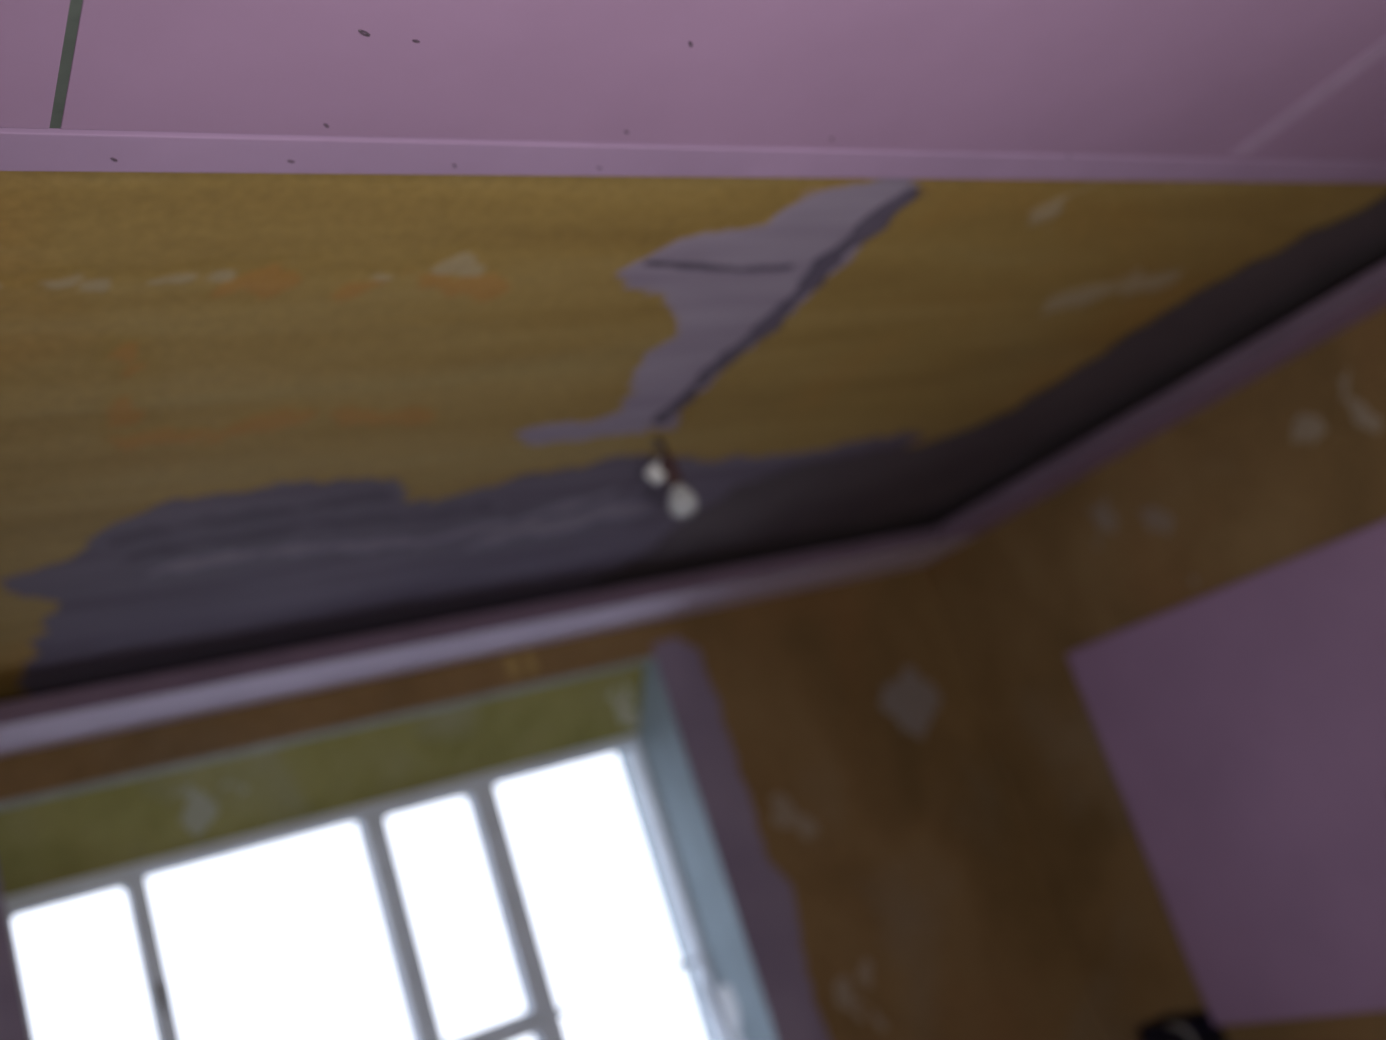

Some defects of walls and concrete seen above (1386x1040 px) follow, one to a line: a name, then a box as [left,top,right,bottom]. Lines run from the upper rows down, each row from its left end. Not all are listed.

peeling [572,196,1386,596]